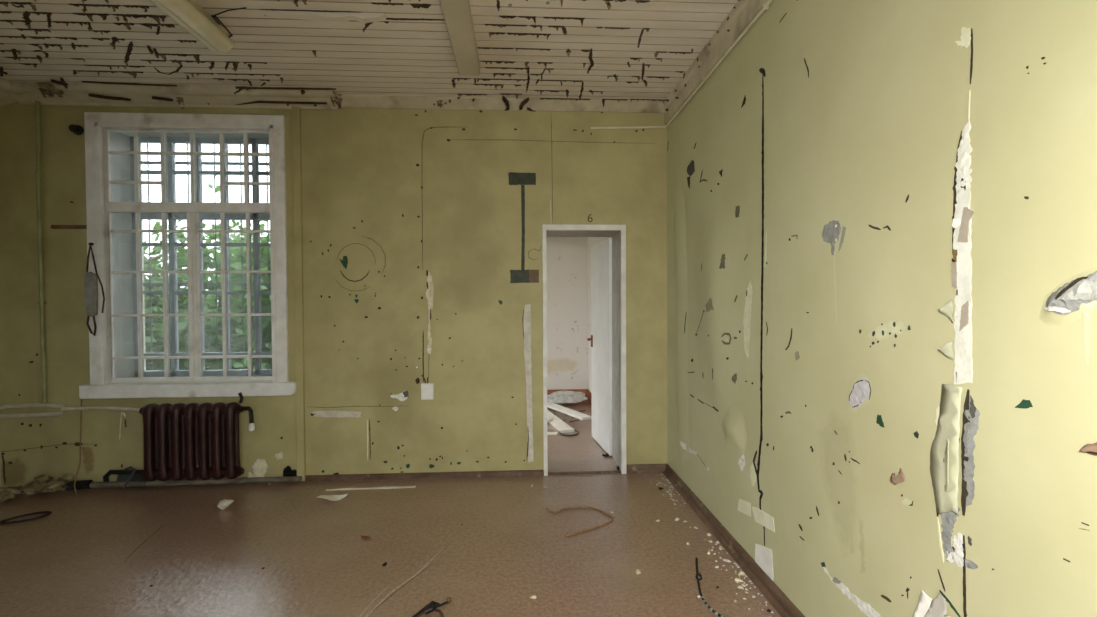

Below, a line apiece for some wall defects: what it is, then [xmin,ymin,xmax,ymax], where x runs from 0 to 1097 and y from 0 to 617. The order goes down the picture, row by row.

peeling [371,0,431,9]
peeling [0,0,343,109]
peeling [433,0,700,112]
peeling [955,27,971,48]
flaking render [822,220,846,255]
crack [753,68,767,546]
peeling [930,121,980,569]
flaking render [845,368,884,427]
peeling [1079,442,1097,456]
peeling [881,576,950,617]